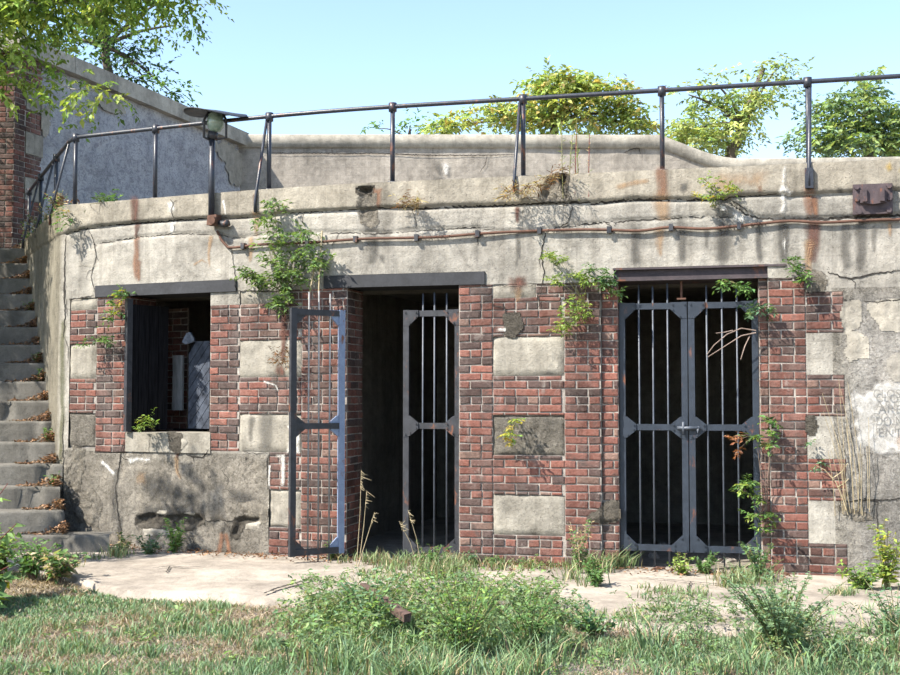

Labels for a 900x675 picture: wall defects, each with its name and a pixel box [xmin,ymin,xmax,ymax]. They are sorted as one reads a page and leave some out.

rust [132,198,140,280]
crack [290,194,900,314]
rust [805,188,819,269]
peeling [840,299,900,362]
crack [112,435,128,531]
spalling [134,510,205,536]
spalling [230,515,261,540]